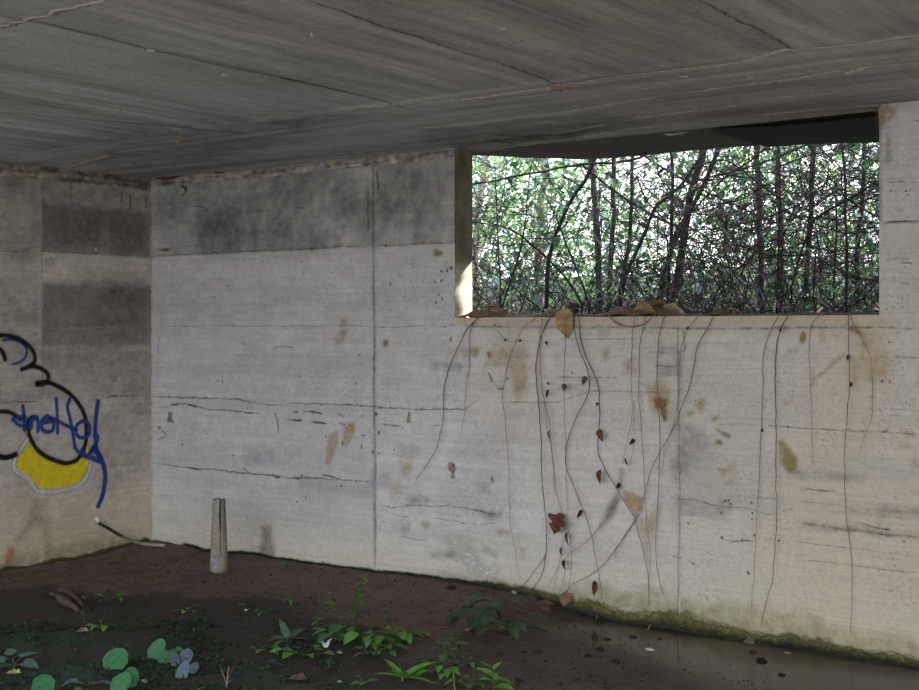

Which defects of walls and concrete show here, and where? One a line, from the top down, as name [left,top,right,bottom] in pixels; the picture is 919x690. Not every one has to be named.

crack [0,0,105,33]
crack [280,5,915,152]
corrosion [655,397,667,420]